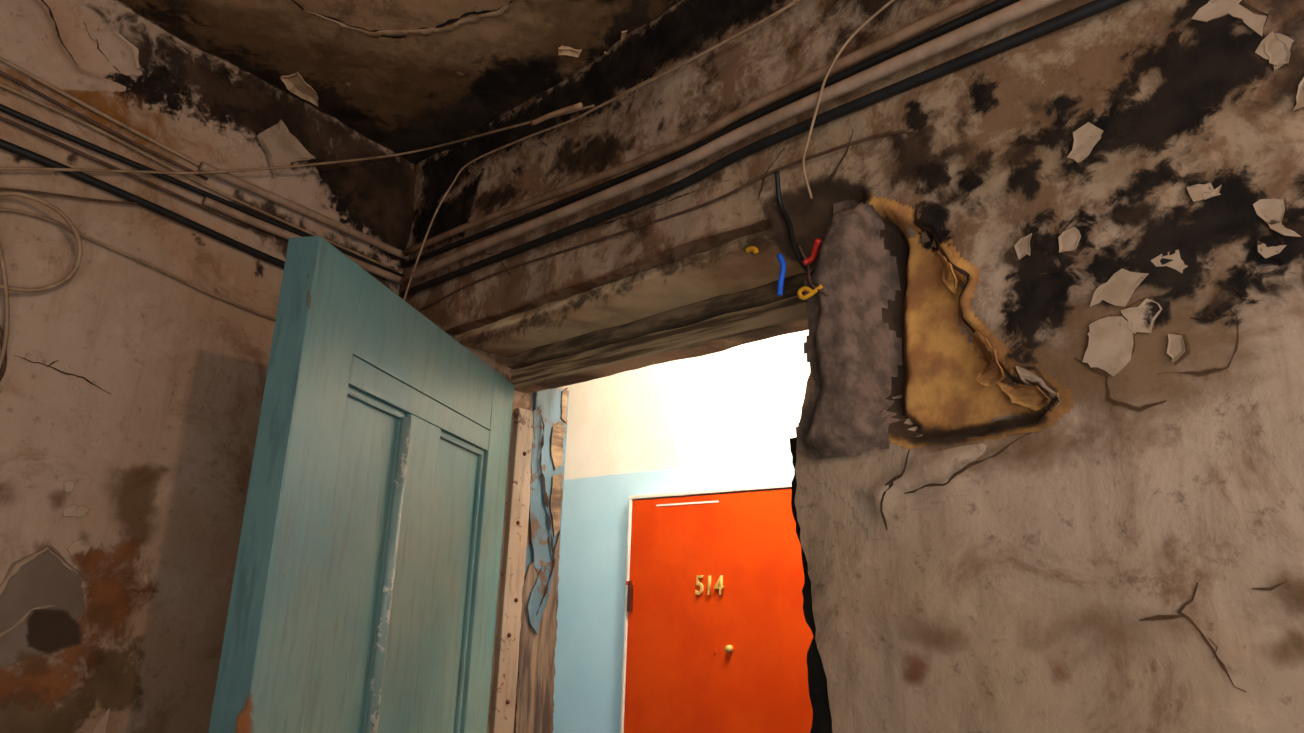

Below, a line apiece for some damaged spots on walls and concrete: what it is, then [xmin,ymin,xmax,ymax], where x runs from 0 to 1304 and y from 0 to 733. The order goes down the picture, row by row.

damp [823,0,904,60]
peeling [1191,0,1294,71]
damp [59,0,792,291]
peeling [1067,122,1103,163]
damp [889,0,1304,405]
peeling [1187,183,1222,202]
peeling [1251,199,1301,259]
peeling [1074,250,1239,412]
spalling [764,177,1074,733]
peeling [0,538,155,733]
crack [1139,583,1247,692]
crack [1252,581,1288,591]